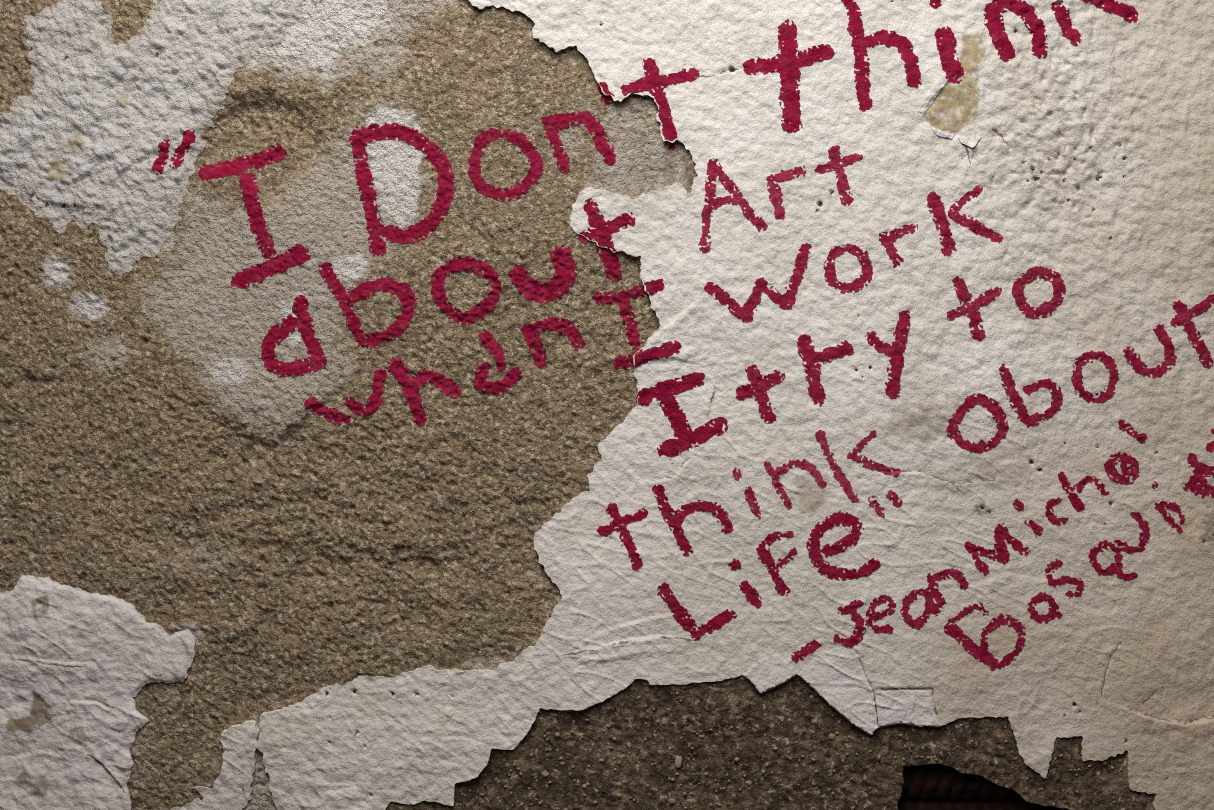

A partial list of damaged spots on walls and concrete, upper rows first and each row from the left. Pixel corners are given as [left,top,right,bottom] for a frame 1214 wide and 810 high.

peeling [917,35,984,148]
spalling [0,0,698,810]
spalling [385,647,1156,810]